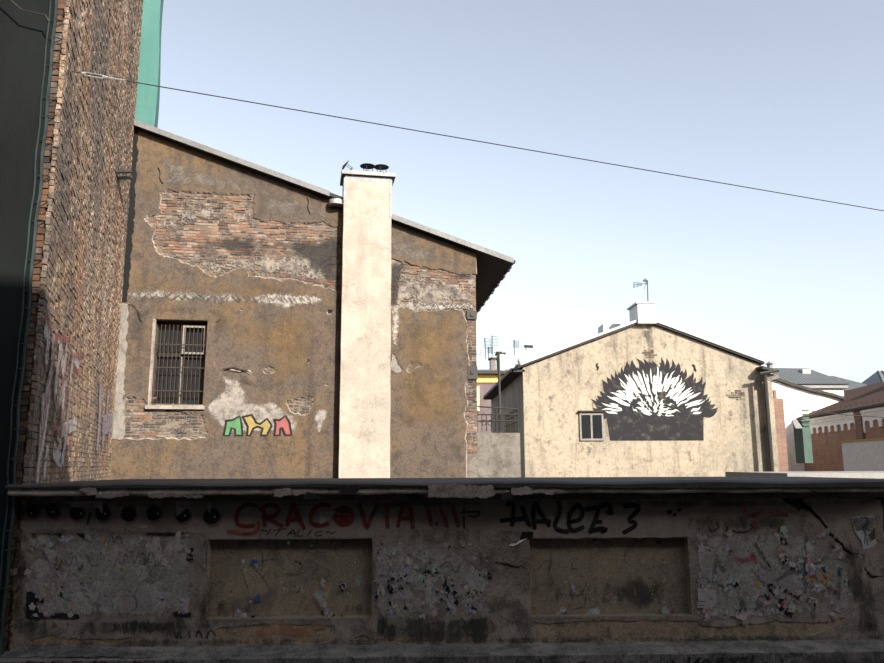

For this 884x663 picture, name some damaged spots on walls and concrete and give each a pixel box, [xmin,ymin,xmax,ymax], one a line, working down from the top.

flaking render [146,190,343,294]
peeling [128,290,320,308]
flaking render [391,259,477,373]
flaking render [464,379,478,453]
crack [782,498,855,554]